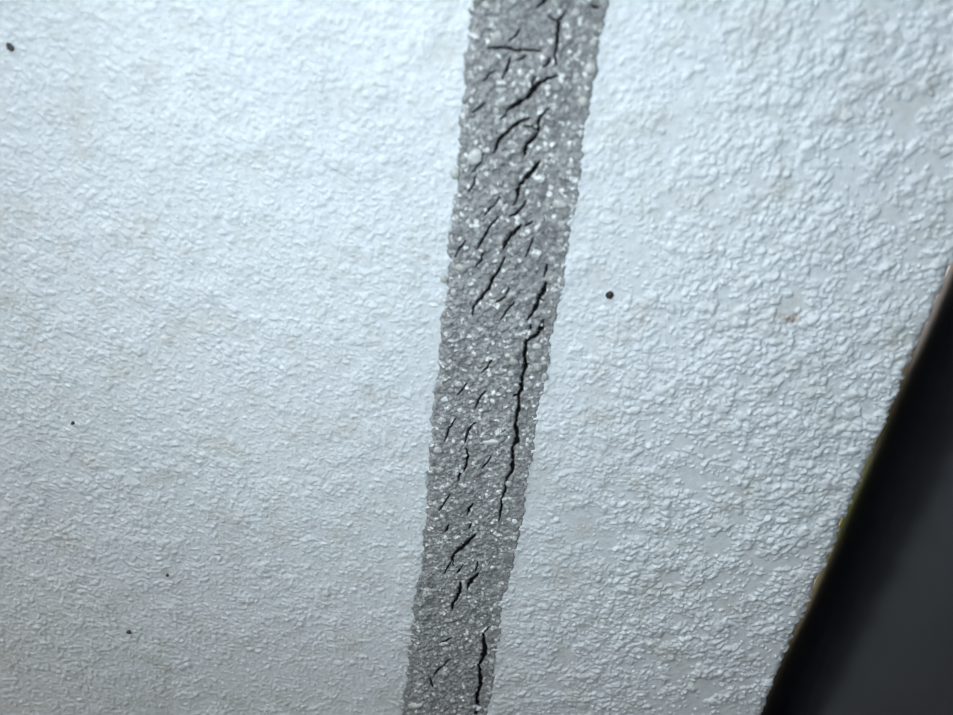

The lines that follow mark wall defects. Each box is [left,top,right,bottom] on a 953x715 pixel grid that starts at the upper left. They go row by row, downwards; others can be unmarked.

crack [474,624,495,715]
crack [430,0,566,687]